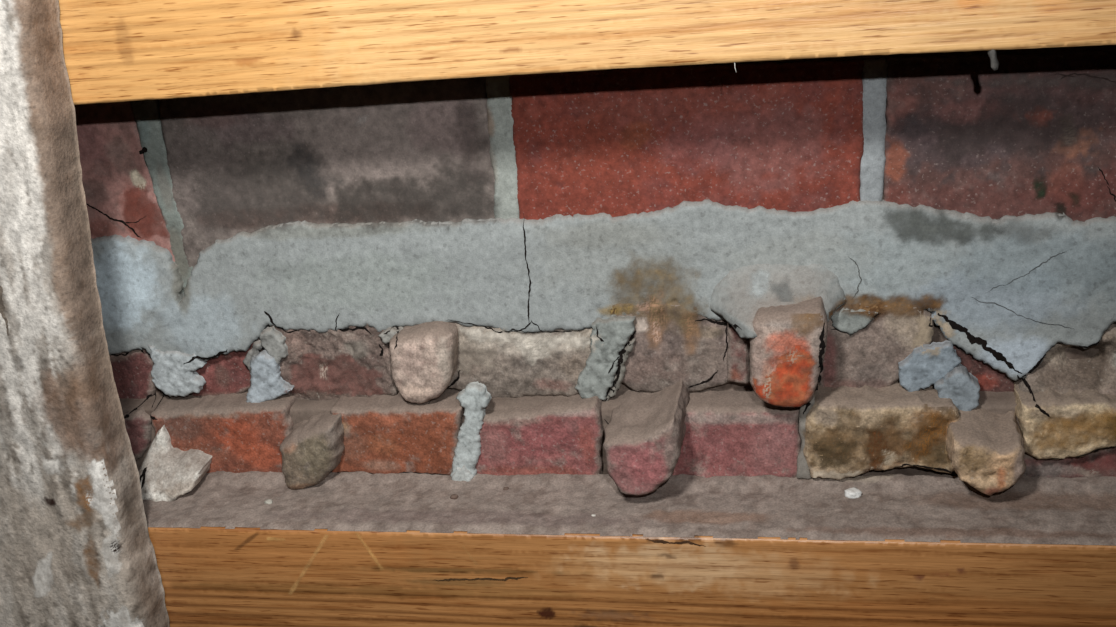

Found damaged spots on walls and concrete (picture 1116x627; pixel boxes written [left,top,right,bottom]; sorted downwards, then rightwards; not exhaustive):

crack [86,203,146,238]
crack [451,213,636,424]
crack [972,251,1102,348]
peeling [148,344,207,397]
peeling [243,326,383,403]
peeling [575,315,636,401]
spalling [753,346,815,407]
peeling [898,340,980,411]
crack [929,311,1050,417]
peeling [138,425,212,502]
peeling [450,381,491,499]
leakage [811,409,956,480]